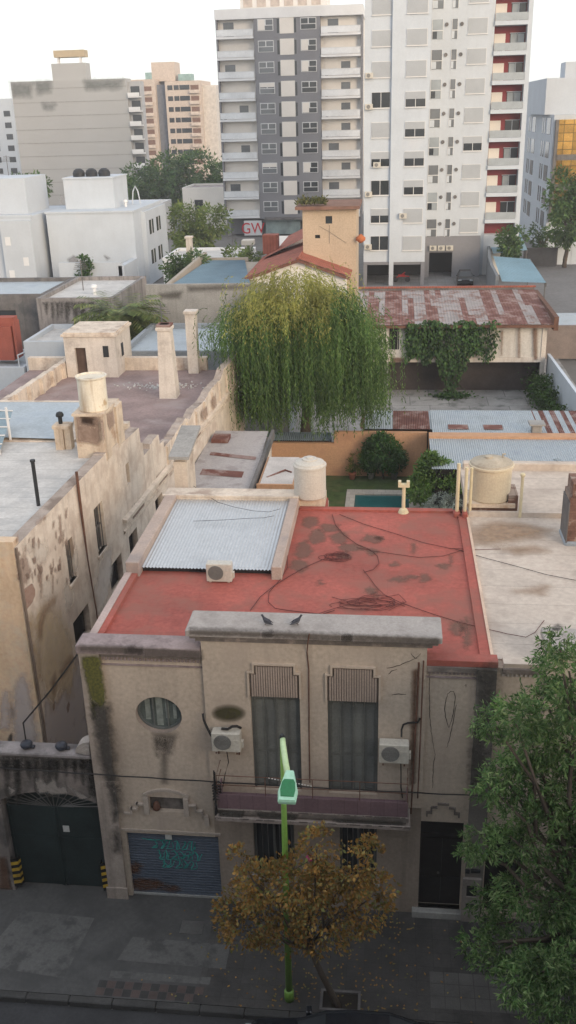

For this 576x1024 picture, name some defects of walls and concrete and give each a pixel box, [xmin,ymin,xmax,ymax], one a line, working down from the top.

peeling [17,535,77,609]
water stain [0,706,120,851]
crack [389,654,456,788]
corrosion [131,863,178,891]